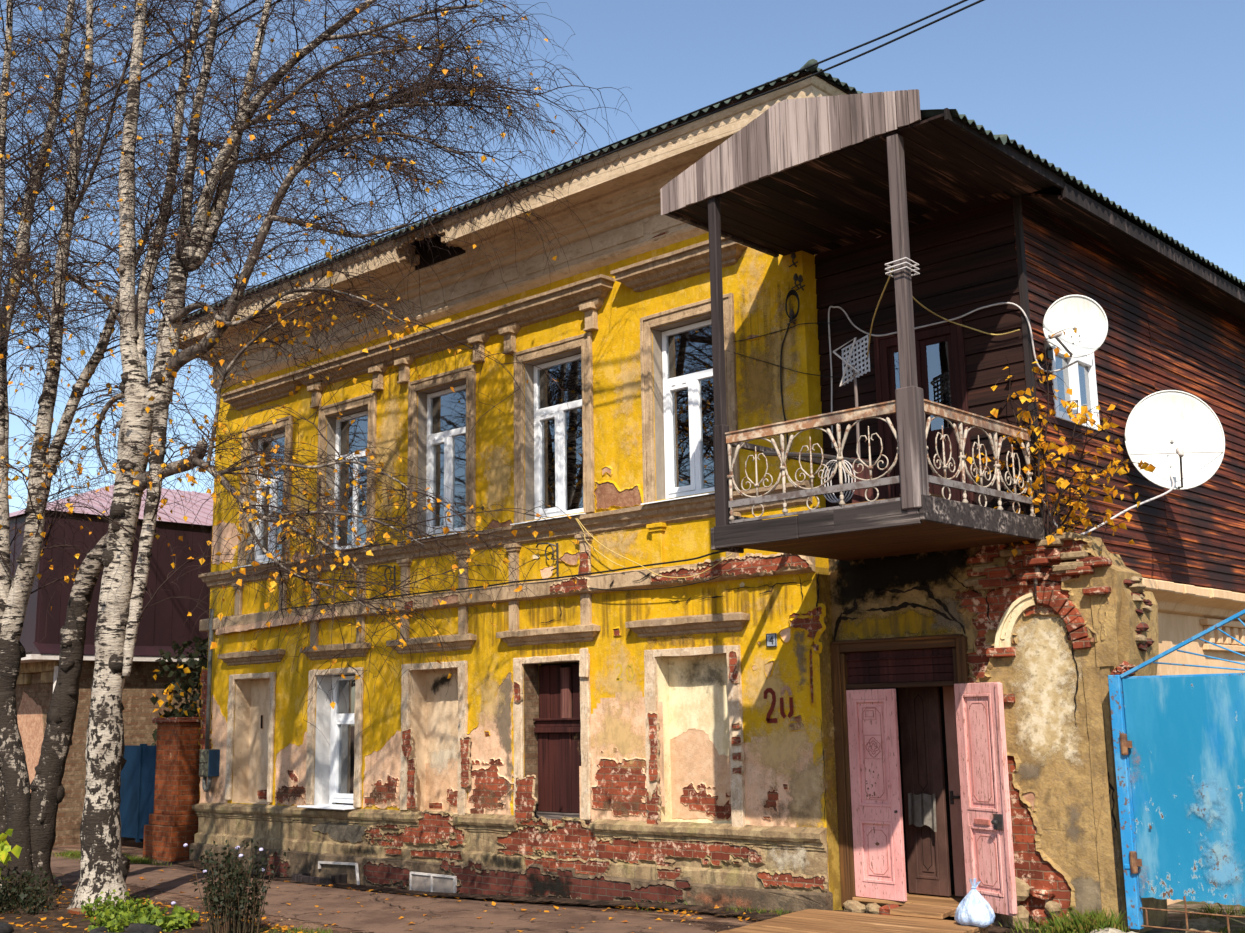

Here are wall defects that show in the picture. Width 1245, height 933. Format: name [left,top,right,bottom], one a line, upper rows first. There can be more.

spalling [594,465,645,511]
crack [669,559,1076,641]
peeling [425,671,514,815]
peeling [579,581,951,830]
crack [1071,645,1079,725]
peeling [1191,780,1224,827]
peeling [1204,841,1241,884]